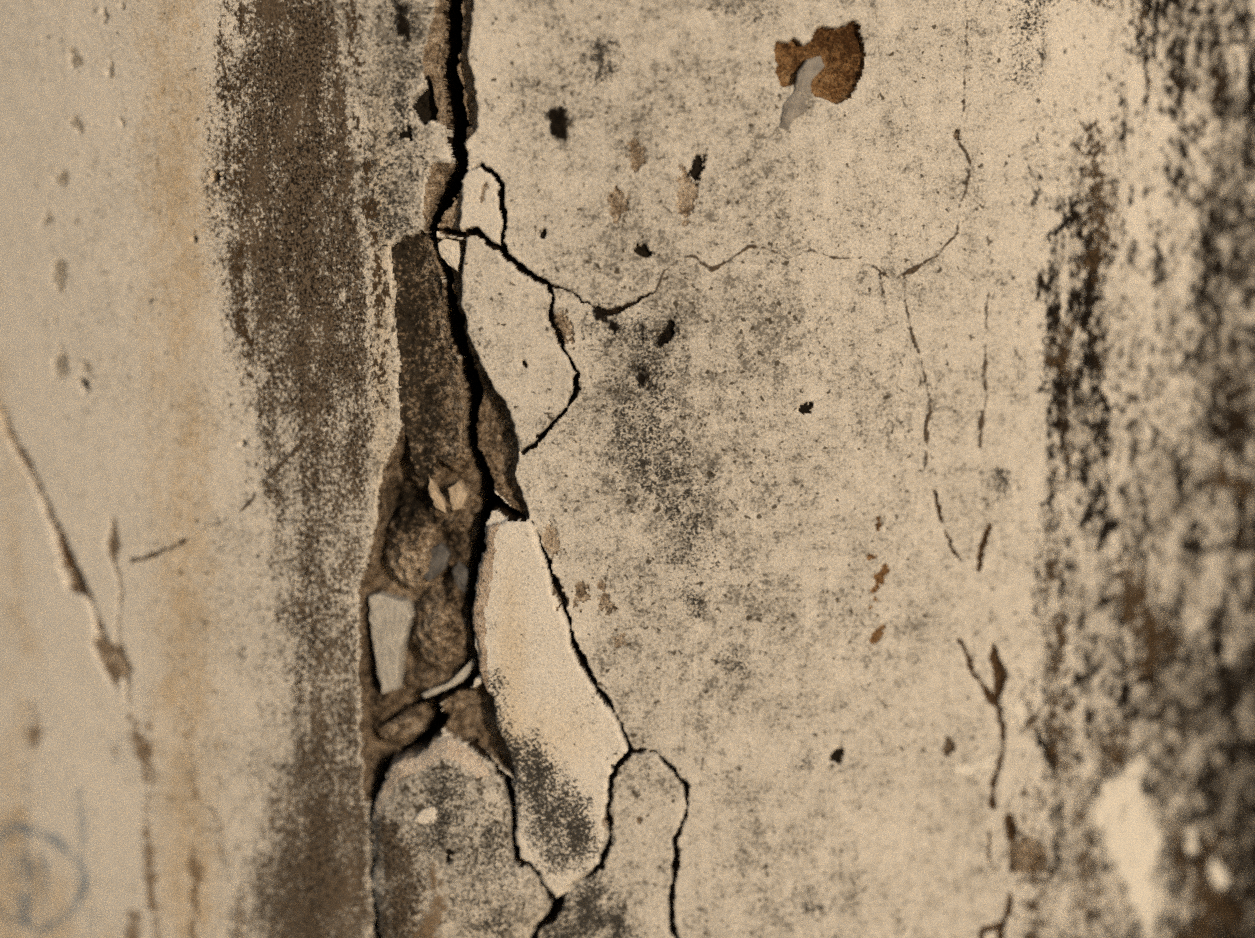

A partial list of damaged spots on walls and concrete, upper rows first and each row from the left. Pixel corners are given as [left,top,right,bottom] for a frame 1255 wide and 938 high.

crack [0,407,306,706]
damp [201,0,643,938]
spalling [358,231,502,803]
spalling [550,309,575,345]
peeling [552,577,619,618]
spalling [607,185,630,225]
spalling [634,244,652,258]
crack [369,0,993,938]
spalling [675,155,707,226]
spalling [774,21,866,131]
damp [1009,0,1255,938]
crack [956,638,1048,938]